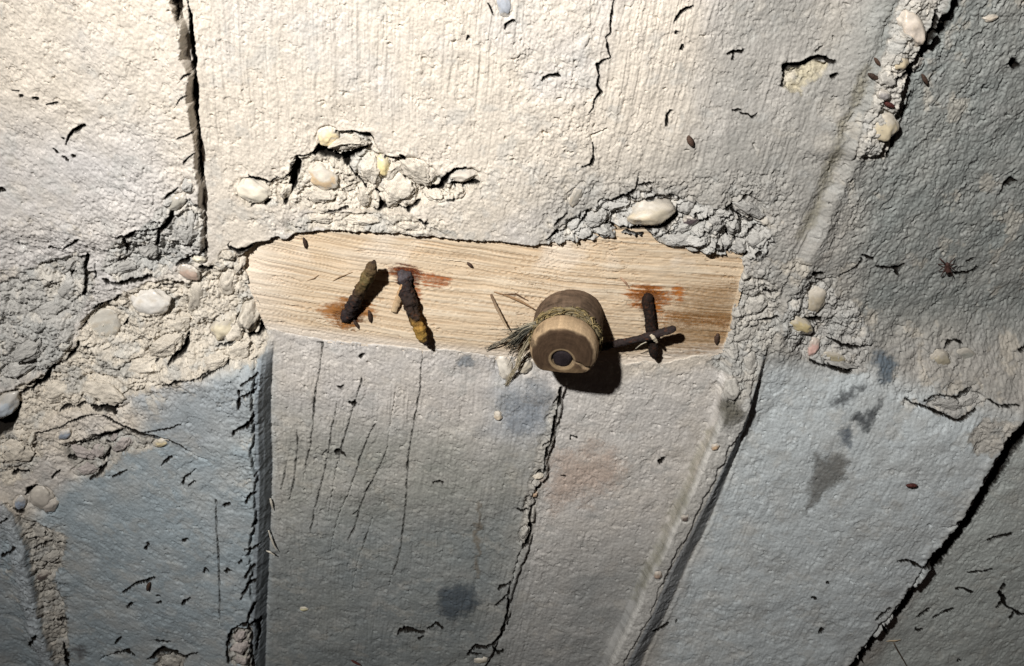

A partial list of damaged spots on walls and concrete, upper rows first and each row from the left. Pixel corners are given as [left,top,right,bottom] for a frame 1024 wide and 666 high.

crack [589,0,615,113]
spalling [782,59,828,93]
spalling [853,0,947,161]
crack [8,0,280,393]
spalling [235,131,478,238]
spalling [0,178,267,485]
rust [318,297,374,328]
rust [391,263,451,299]
rust [624,285,733,349]
spalling [547,189,875,417]
crack [215,342,423,666]
crack [850,386,1024,666]